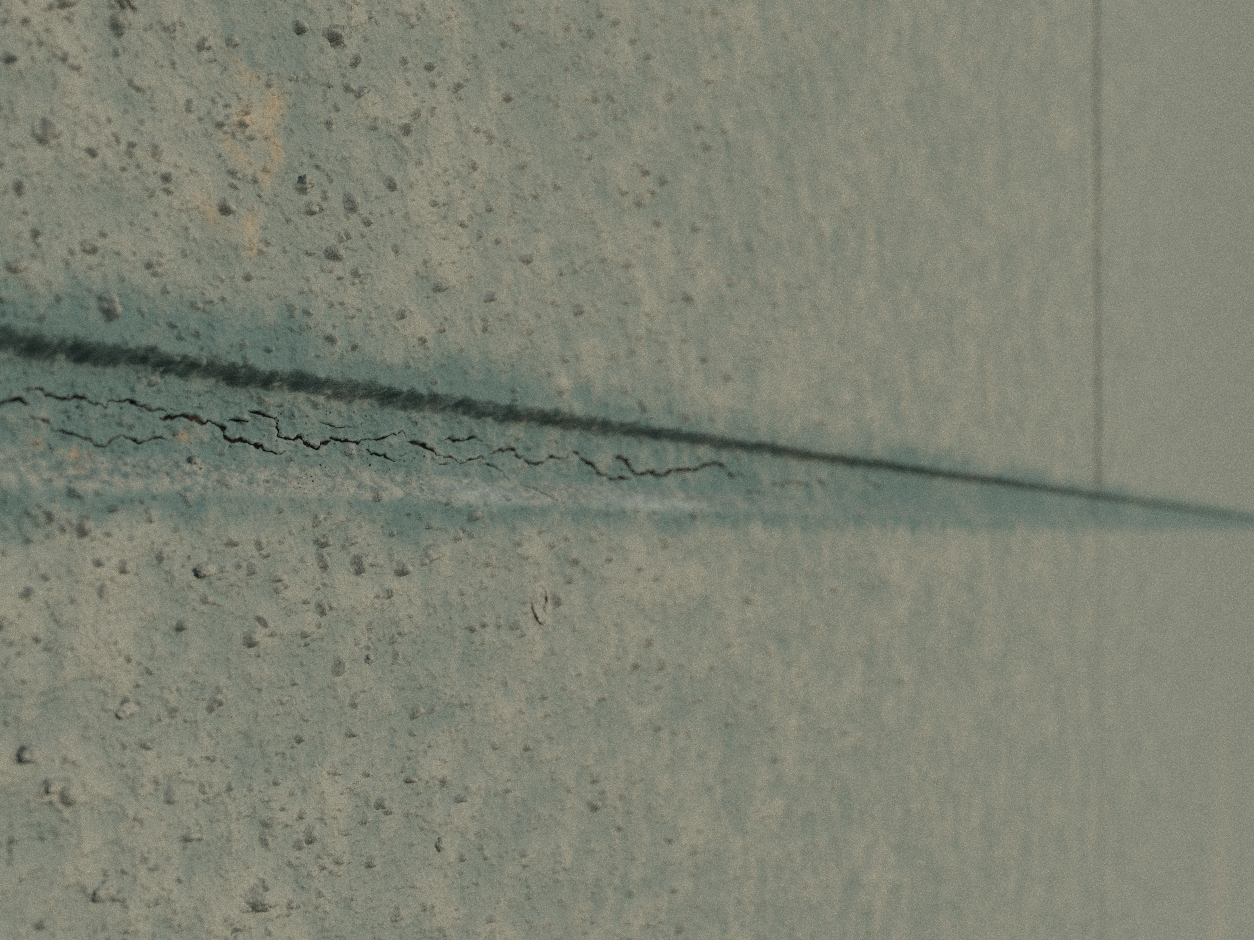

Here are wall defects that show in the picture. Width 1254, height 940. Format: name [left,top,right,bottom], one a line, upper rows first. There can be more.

crack [0,387,826,503]